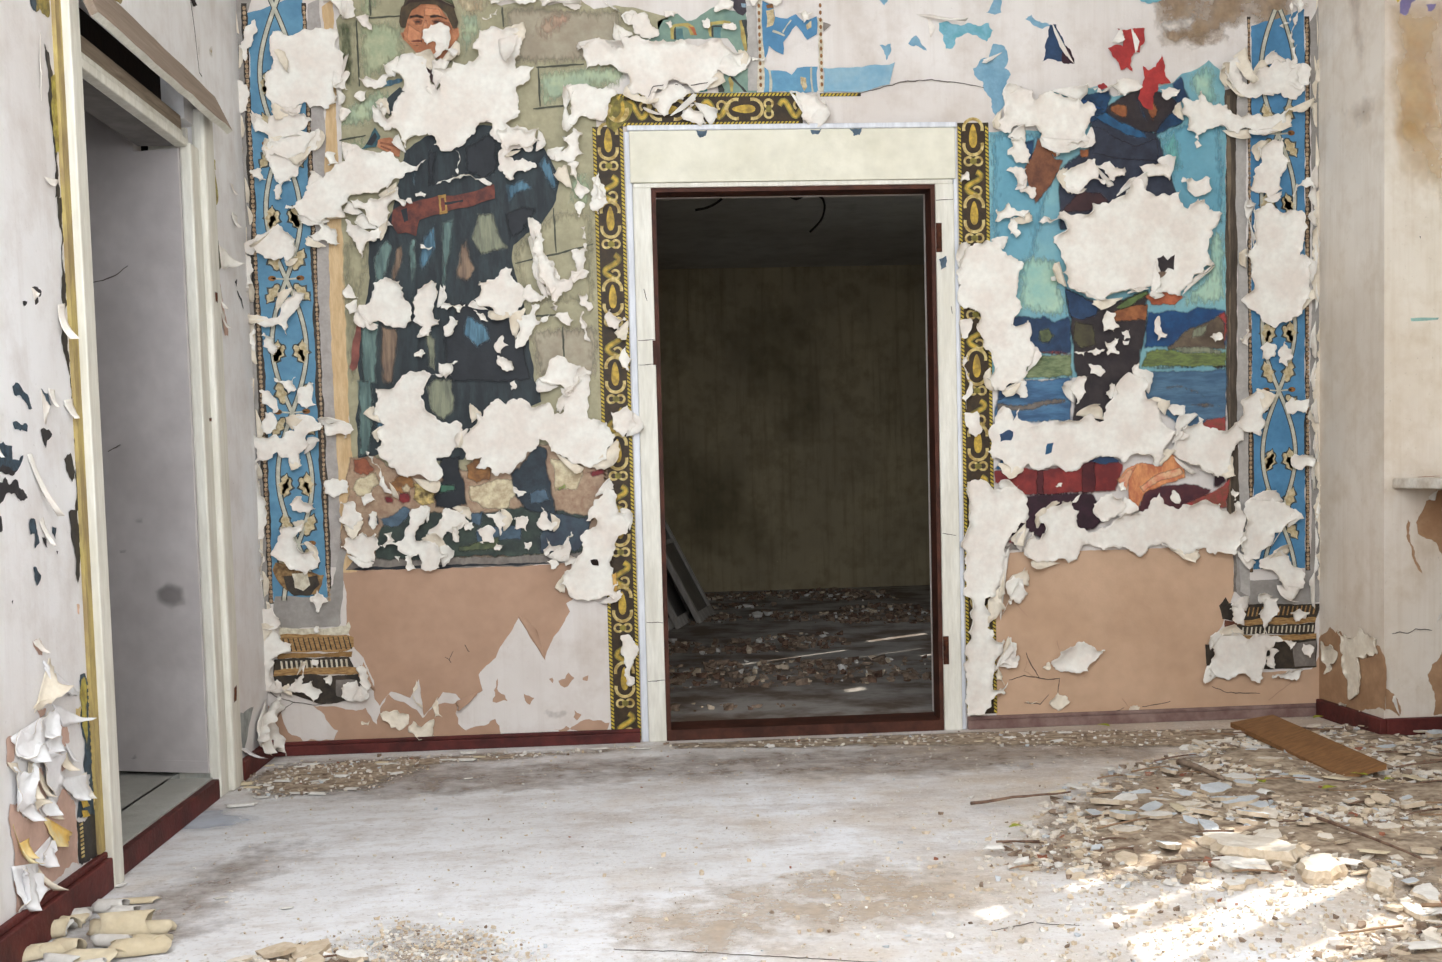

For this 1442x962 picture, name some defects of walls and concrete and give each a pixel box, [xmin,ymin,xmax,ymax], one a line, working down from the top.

leakage [1159,0,1288,45]
peeling [1397,0,1436,15]
peeling [789,91,831,134]
peeling [0,0,80,582]
peeling [214,0,782,759]
peeling [858,0,1401,716]
peeling [1406,477,1442,573]
peeling [1428,654,1442,715]
peeling [6,638,97,913]